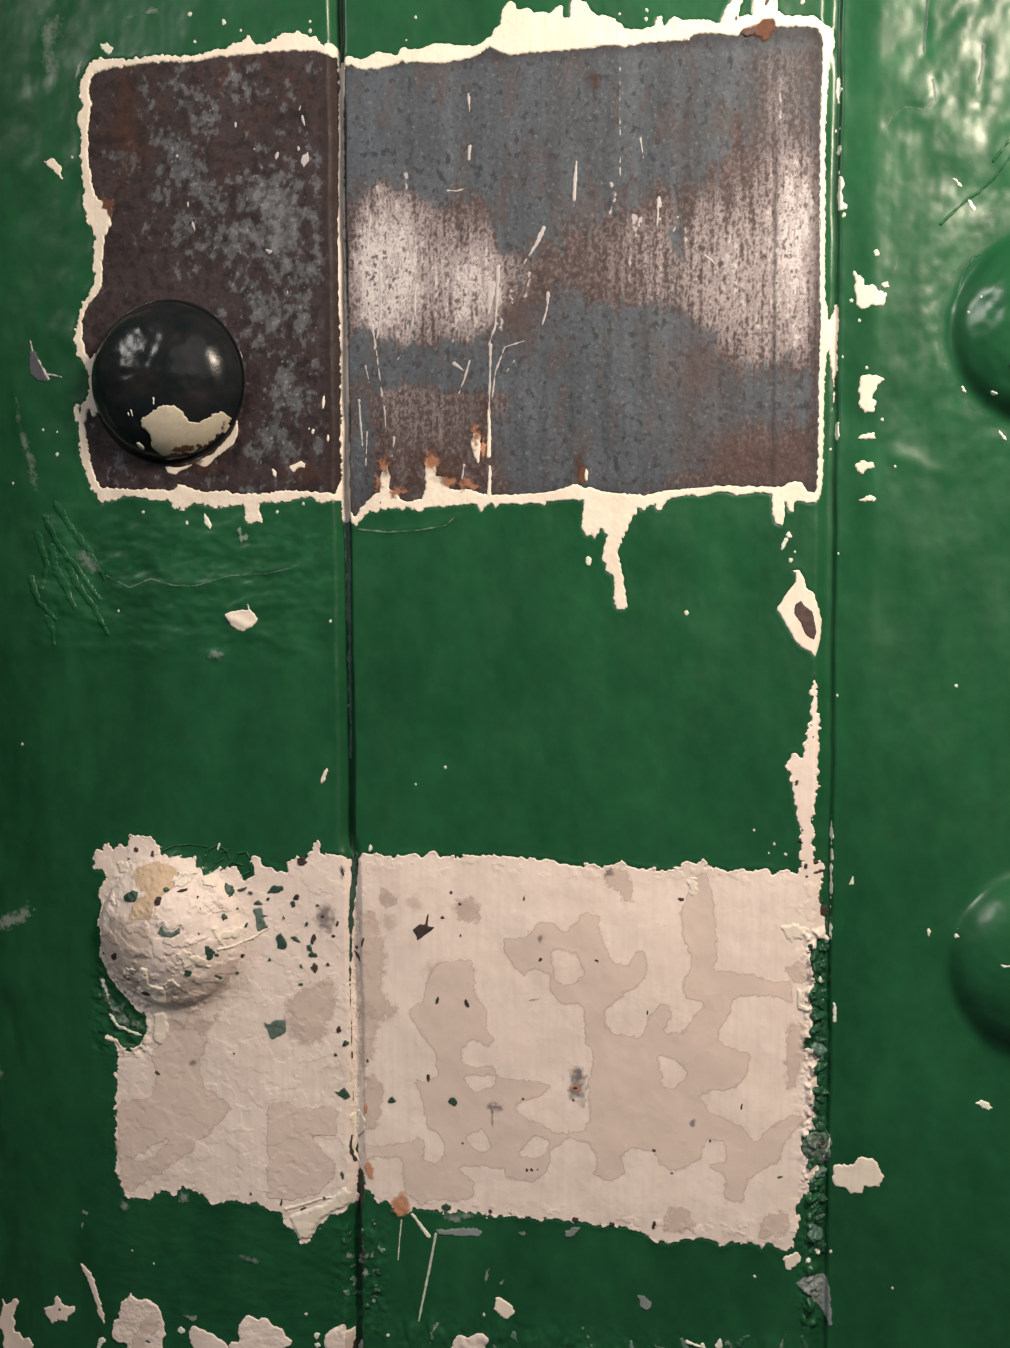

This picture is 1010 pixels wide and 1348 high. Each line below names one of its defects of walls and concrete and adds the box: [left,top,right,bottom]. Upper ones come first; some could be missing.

peeling [44,0,889,759]
corrosion [172,444,202,453]
peeling [92,680,884,1326]
peeling [0,1298,34,1348]
peeling [44,1296,75,1324]
peeling [81,1263,292,1348]
peeling [314,1324,363,1348]
peeling [451,1333,496,1348]
peeling [483,1297,518,1343]
peeling [680,1335,750,1348]